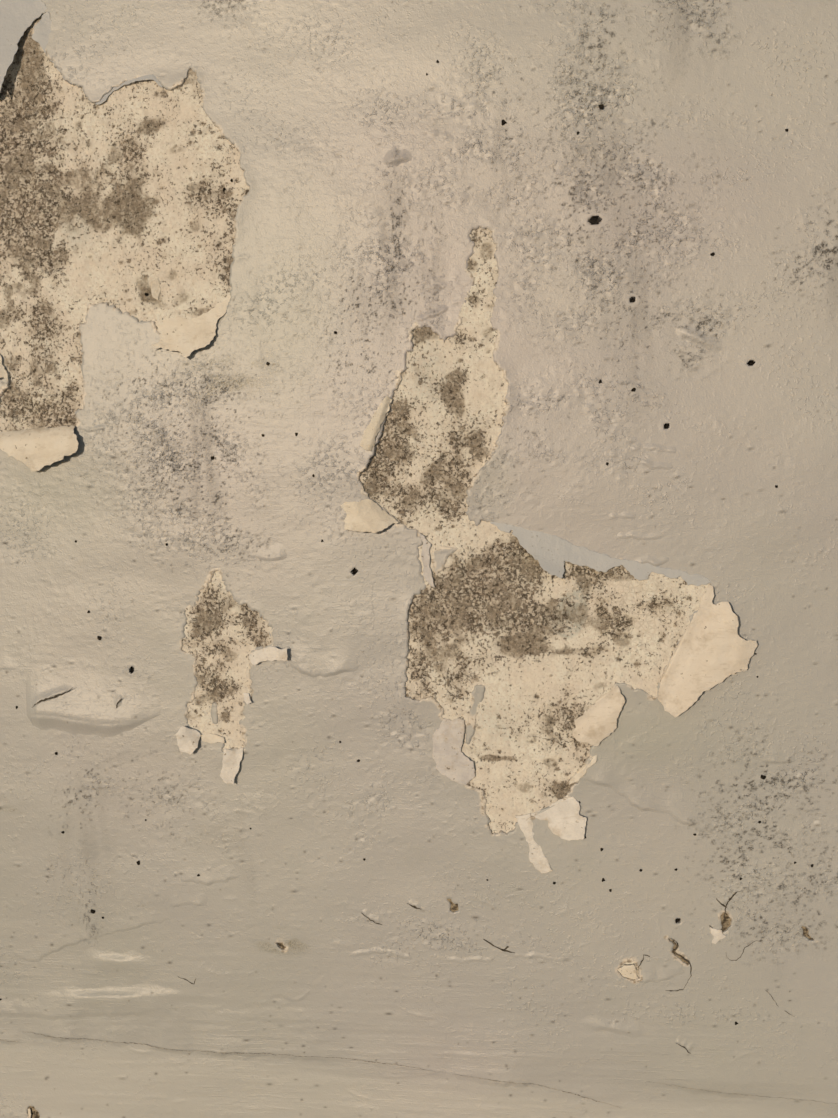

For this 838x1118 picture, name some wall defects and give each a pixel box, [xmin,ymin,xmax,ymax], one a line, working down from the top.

peeling [0,0,249,472]
peeling [175,571,288,785]
peeling [341,227,758,873]